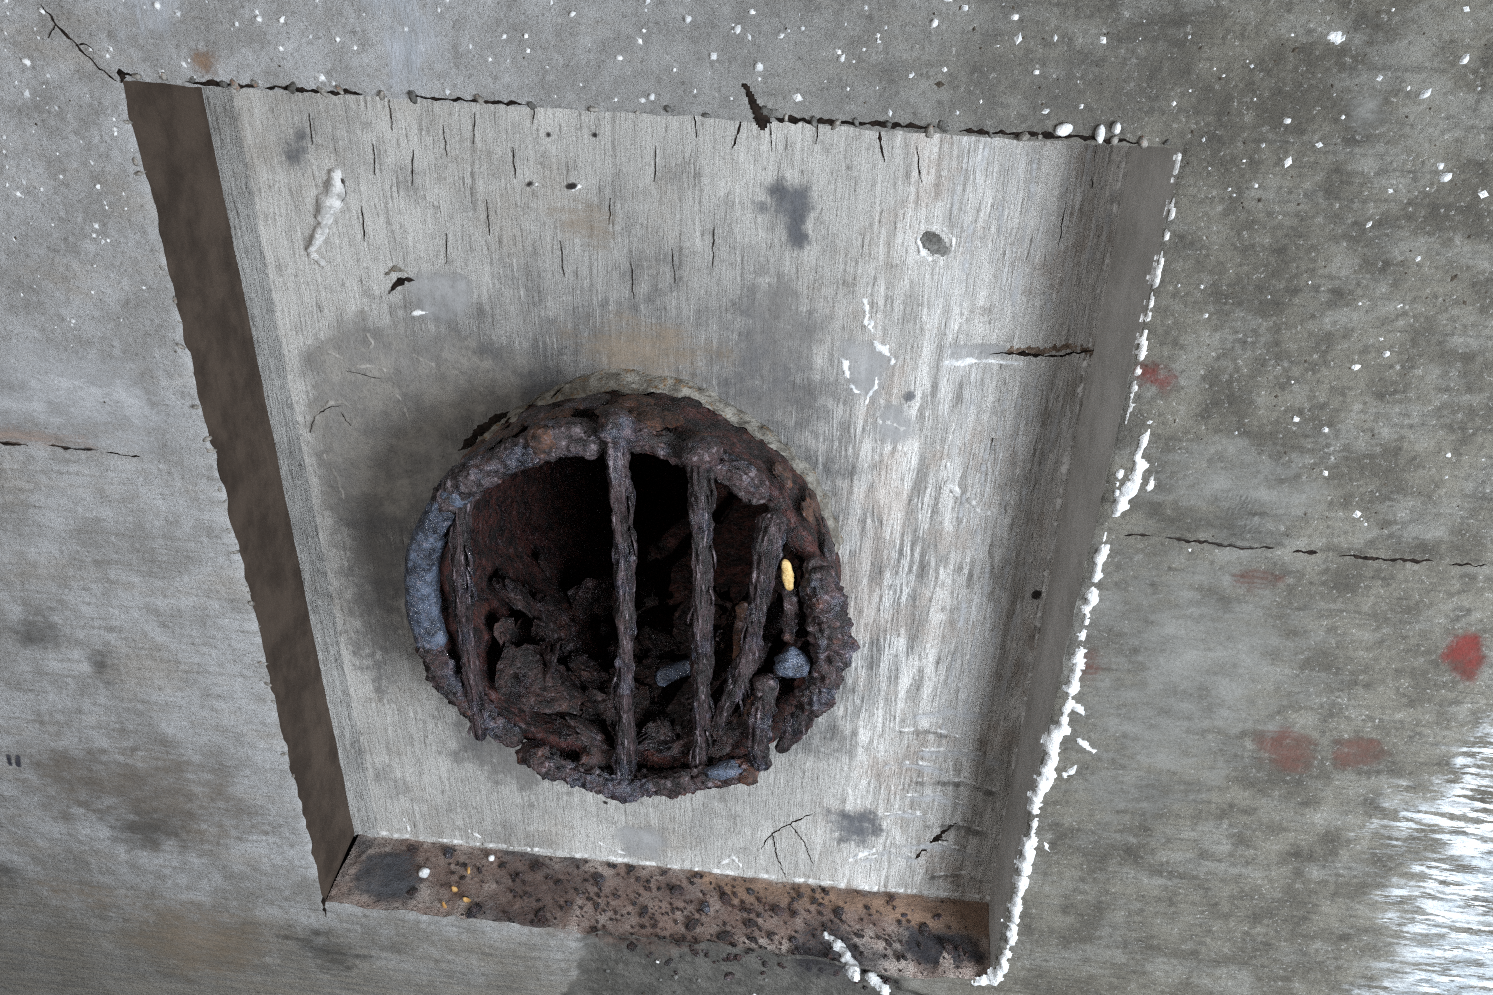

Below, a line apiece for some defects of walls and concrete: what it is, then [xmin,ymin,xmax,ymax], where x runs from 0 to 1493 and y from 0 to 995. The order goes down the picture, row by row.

water stain [1125,152,1182,424]
corrosion [611,497,637,562]
corrosion [781,539,794,591]
water stain [355,429,1315,995]
corrosion [691,871,989,937]
water stain [1382,746,1493,995]